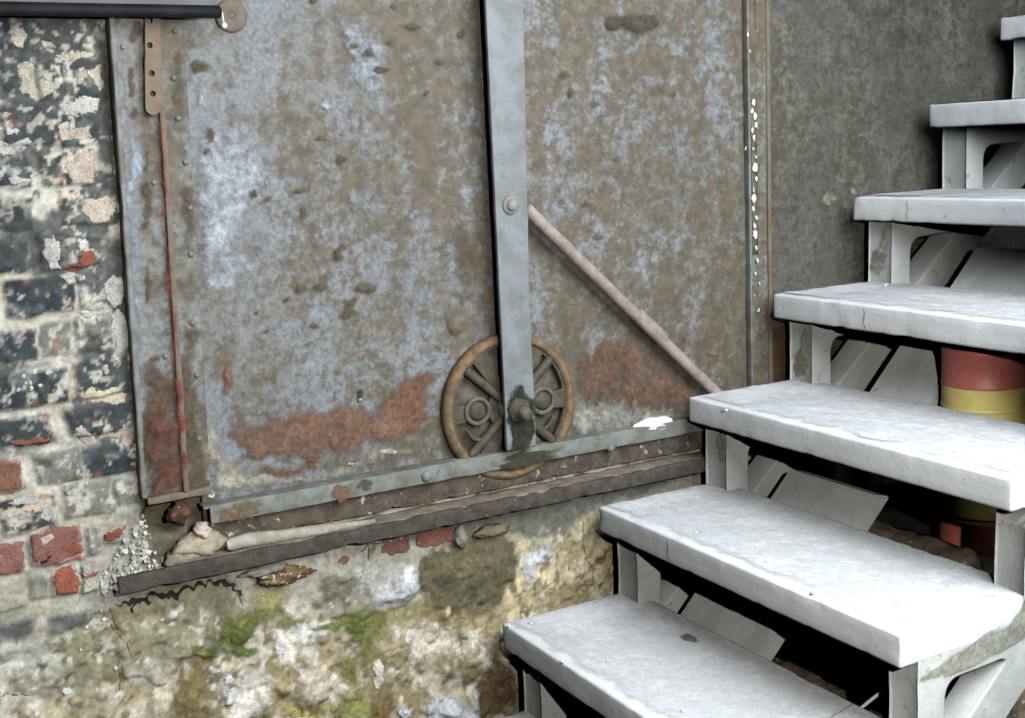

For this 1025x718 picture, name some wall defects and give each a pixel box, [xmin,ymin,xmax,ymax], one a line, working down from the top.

peeling [17,41,104,184]
corrosion [172,53,210,116]
corrosion [143,151,167,229]
peeling [40,235,97,284]
peeling [79,137,144,375]
corrosion [140,315,208,495]
corrosion [231,373,434,477]
spalling [0,461,99,595]
leakage [420,536,552,620]
crack [87,579,243,692]
leakage [175,659,212,718]
leakage [370,700,397,718]